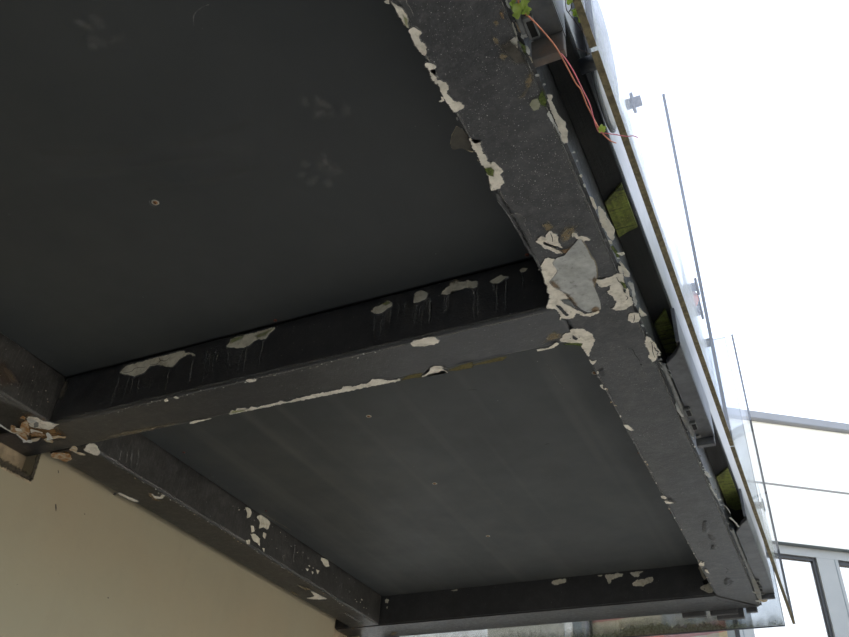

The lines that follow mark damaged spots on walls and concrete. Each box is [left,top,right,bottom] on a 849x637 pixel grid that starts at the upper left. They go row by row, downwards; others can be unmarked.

peeling [384,0,465,129]
peeling [535,74,568,144]
peeling [468,137,672,390]
peeling [441,279,479,296]
peeling [371,300,393,315]
peeling [226,327,276,349]
peeling [410,336,440,347]
peeling [421,365,449,377]
peeling [229,378,401,415]
spalling [0,416,100,462]
peeling [234,507,286,554]
peeling [598,571,654,587]